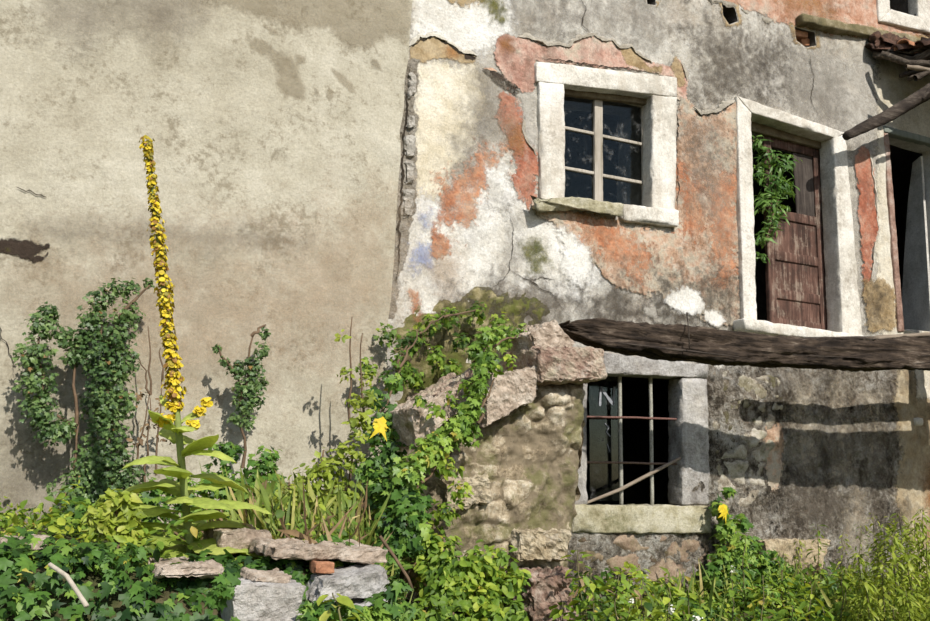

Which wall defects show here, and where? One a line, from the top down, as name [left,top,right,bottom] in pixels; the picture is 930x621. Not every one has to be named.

spalling [409,32,478,64]
peeling [483,33,740,328]
peeling [855,146,880,292]
spalling [568,362,917,605]
water stain [777,374,890,562]